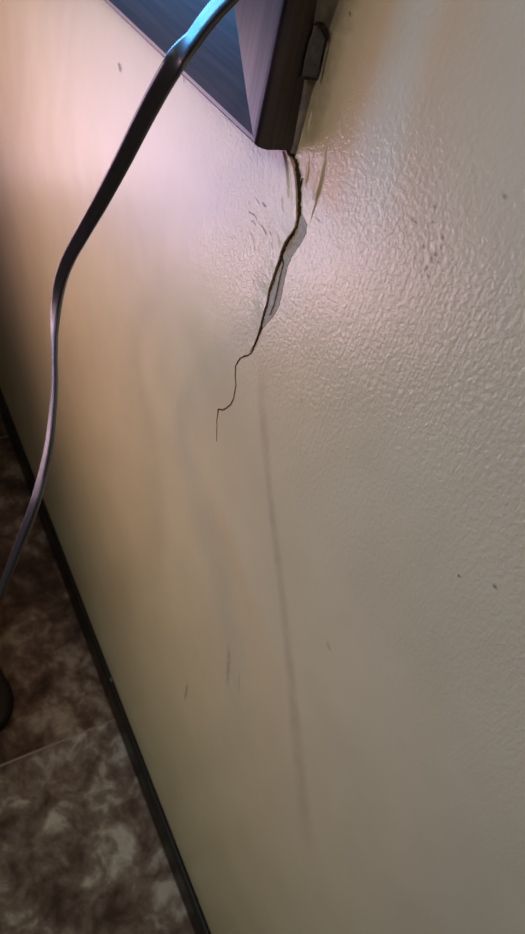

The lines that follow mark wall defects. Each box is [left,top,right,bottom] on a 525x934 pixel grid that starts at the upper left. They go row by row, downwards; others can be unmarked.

crack [216,153,319,441]